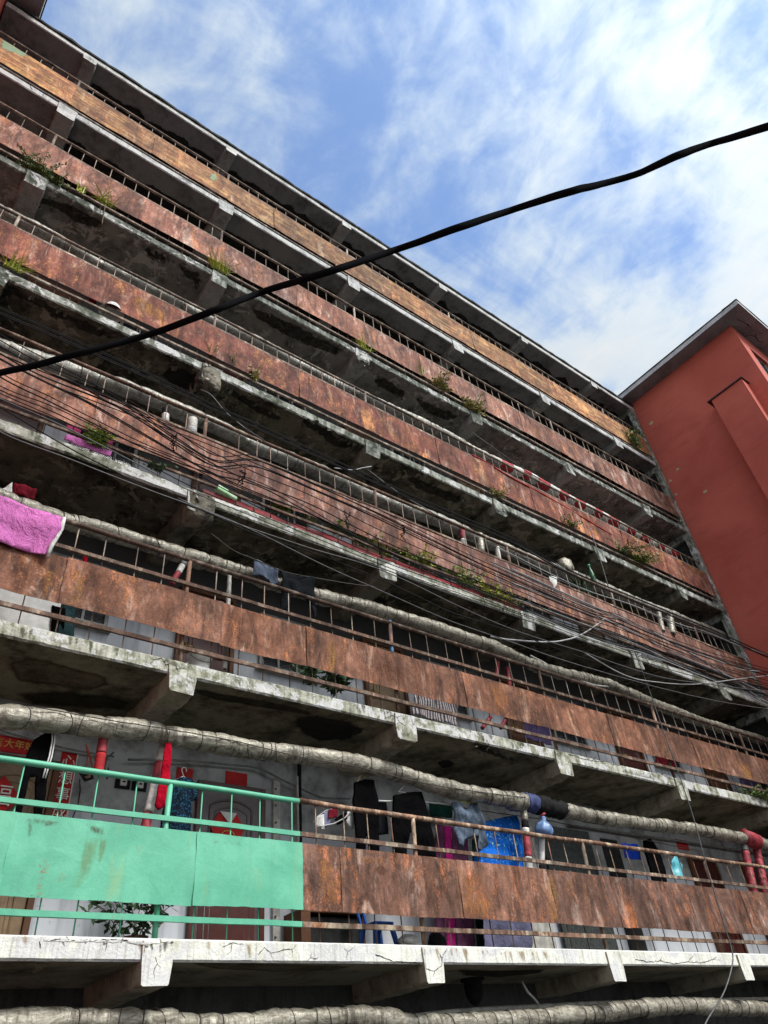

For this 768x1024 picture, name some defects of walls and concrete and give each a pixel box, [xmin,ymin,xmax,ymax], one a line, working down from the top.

damp [11,659,128,710]
crack [344,948,447,973]
crack [635,955,716,964]